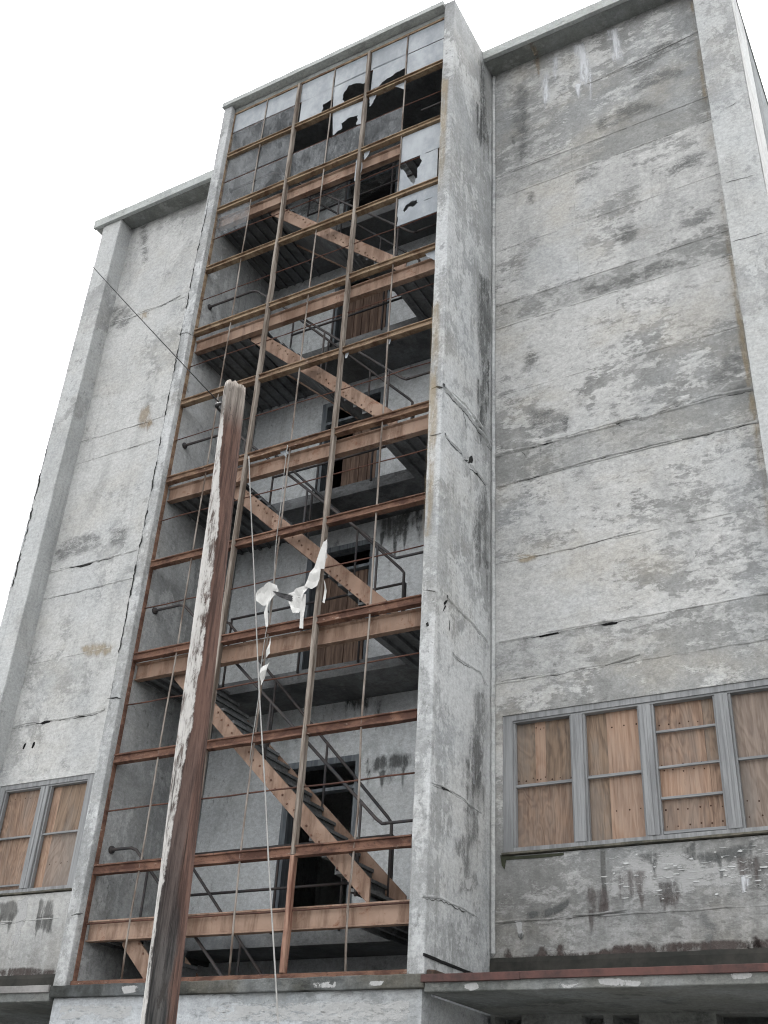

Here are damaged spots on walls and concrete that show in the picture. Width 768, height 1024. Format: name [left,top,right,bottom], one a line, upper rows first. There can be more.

damp [607,29,620,60]
damp [575,45,591,95]
crack [430,383,759,488]
crack [10,196,210,727]
crack [426,590,640,686]
damp [467,692,484,798]
damp [367,755,409,786]
damp [628,852,657,904]
damp [660,883,679,903]
damp [687,843,759,891]
damp [0,898,53,948]